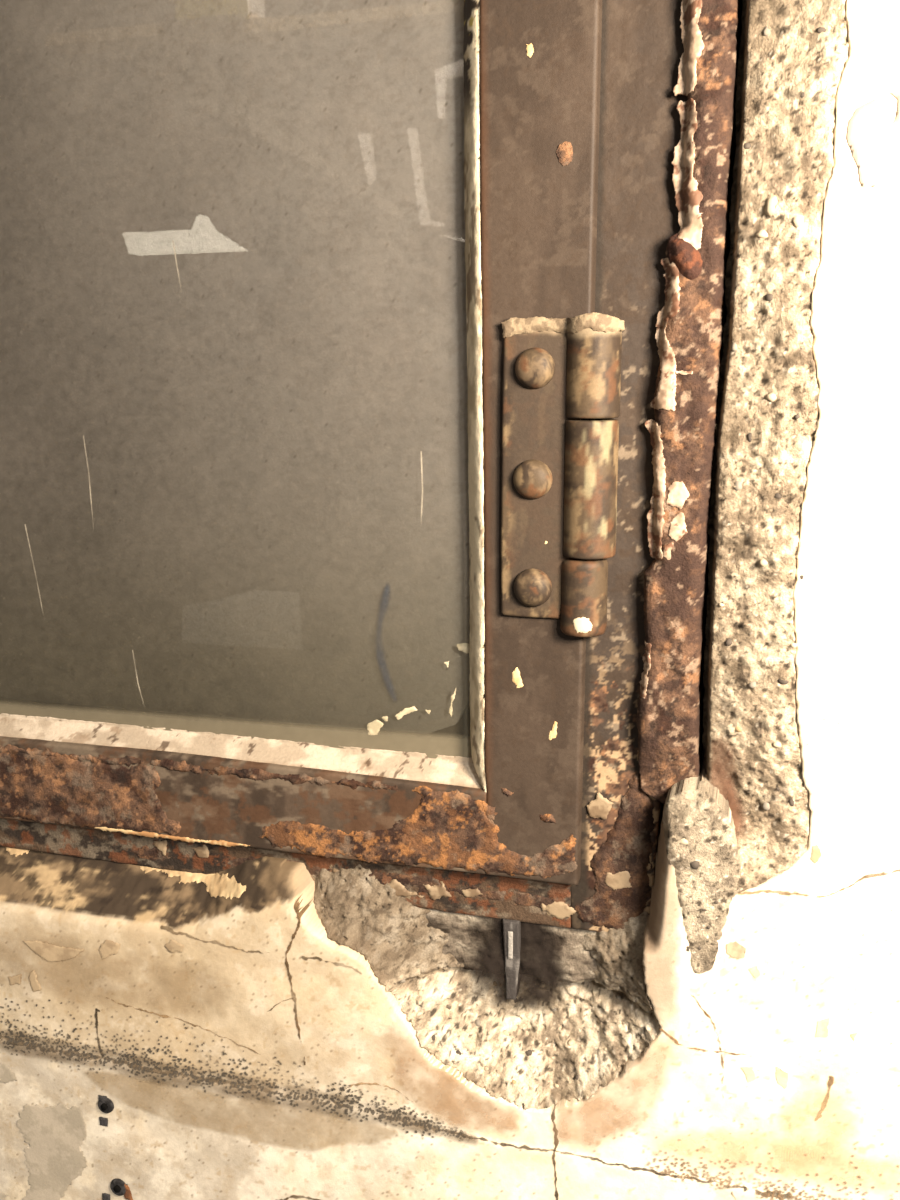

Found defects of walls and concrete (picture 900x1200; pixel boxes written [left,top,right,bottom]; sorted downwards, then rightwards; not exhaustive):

peeling [644,258,693,561]
spalling [662,0,900,978]
rust [0,744,655,930]
peeling [586,792,614,819]
crack [7,896,336,1088]
damp [0,998,516,1145]
spalling [311,864,660,1110]
crack [435,1106,816,1200]
damp [651,1150,741,1189]
crack [659,995,740,1084]
damp [755,1155,881,1200]
crack [815,1076,834,1121]